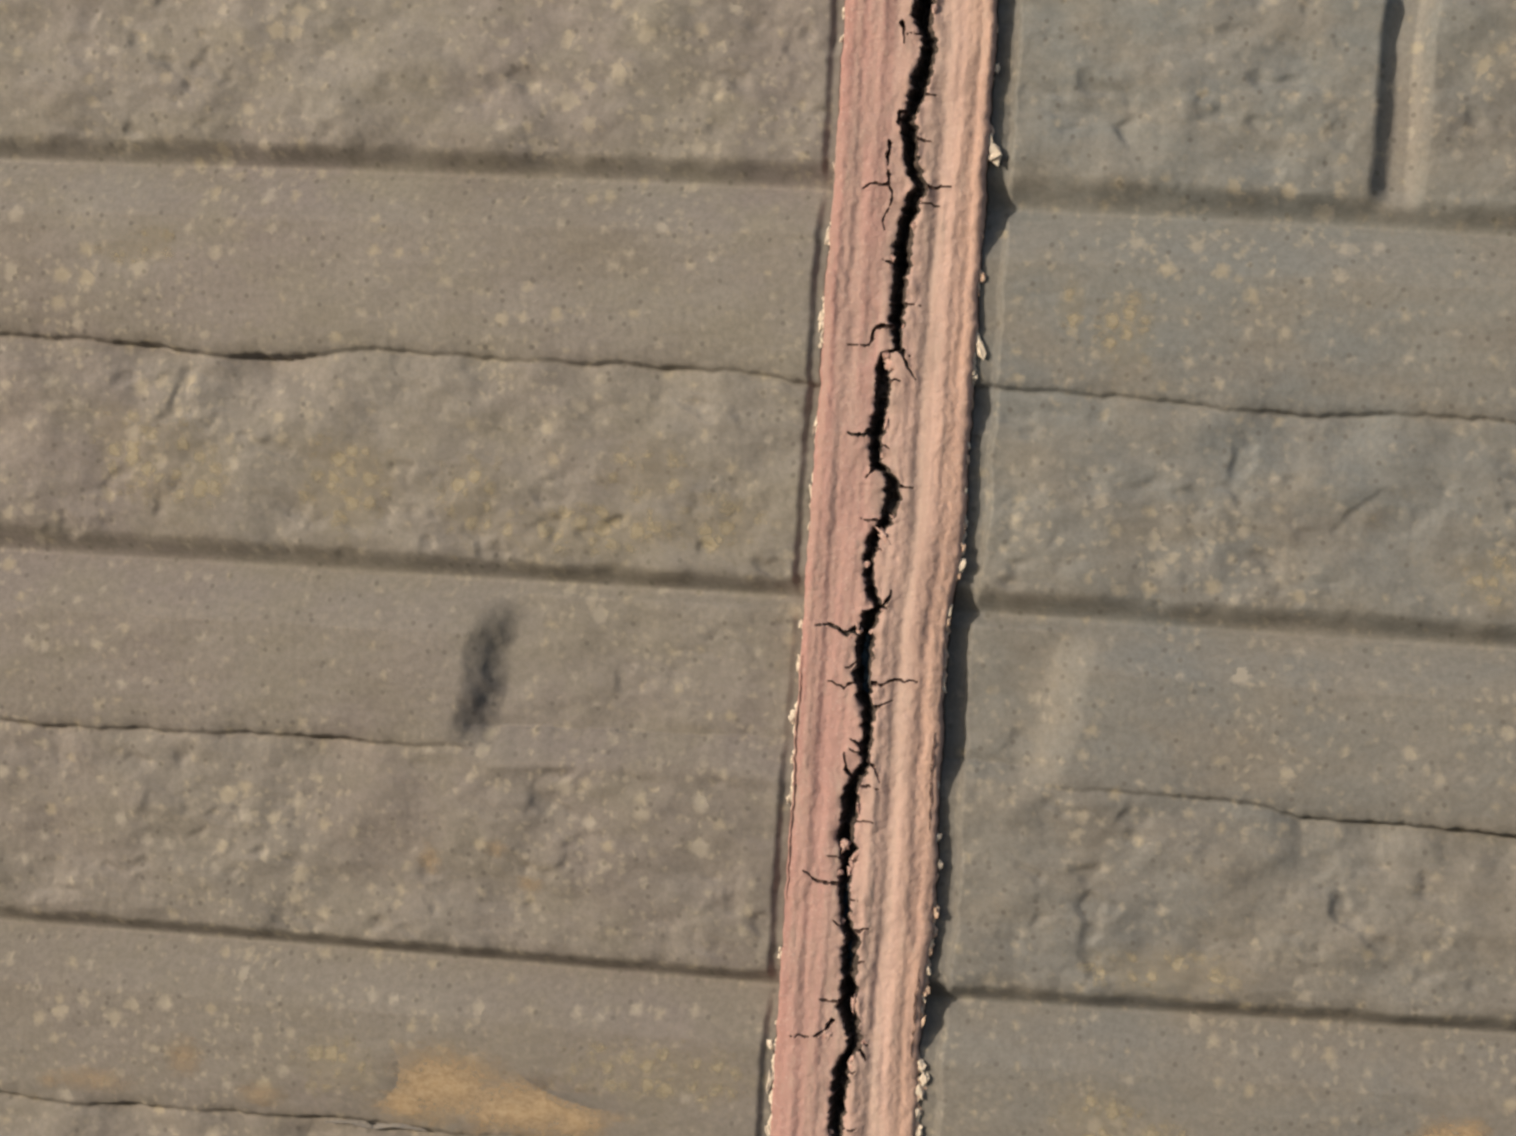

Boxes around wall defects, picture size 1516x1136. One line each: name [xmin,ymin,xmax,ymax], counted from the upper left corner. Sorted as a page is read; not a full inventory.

crack [786,0,952,1136]